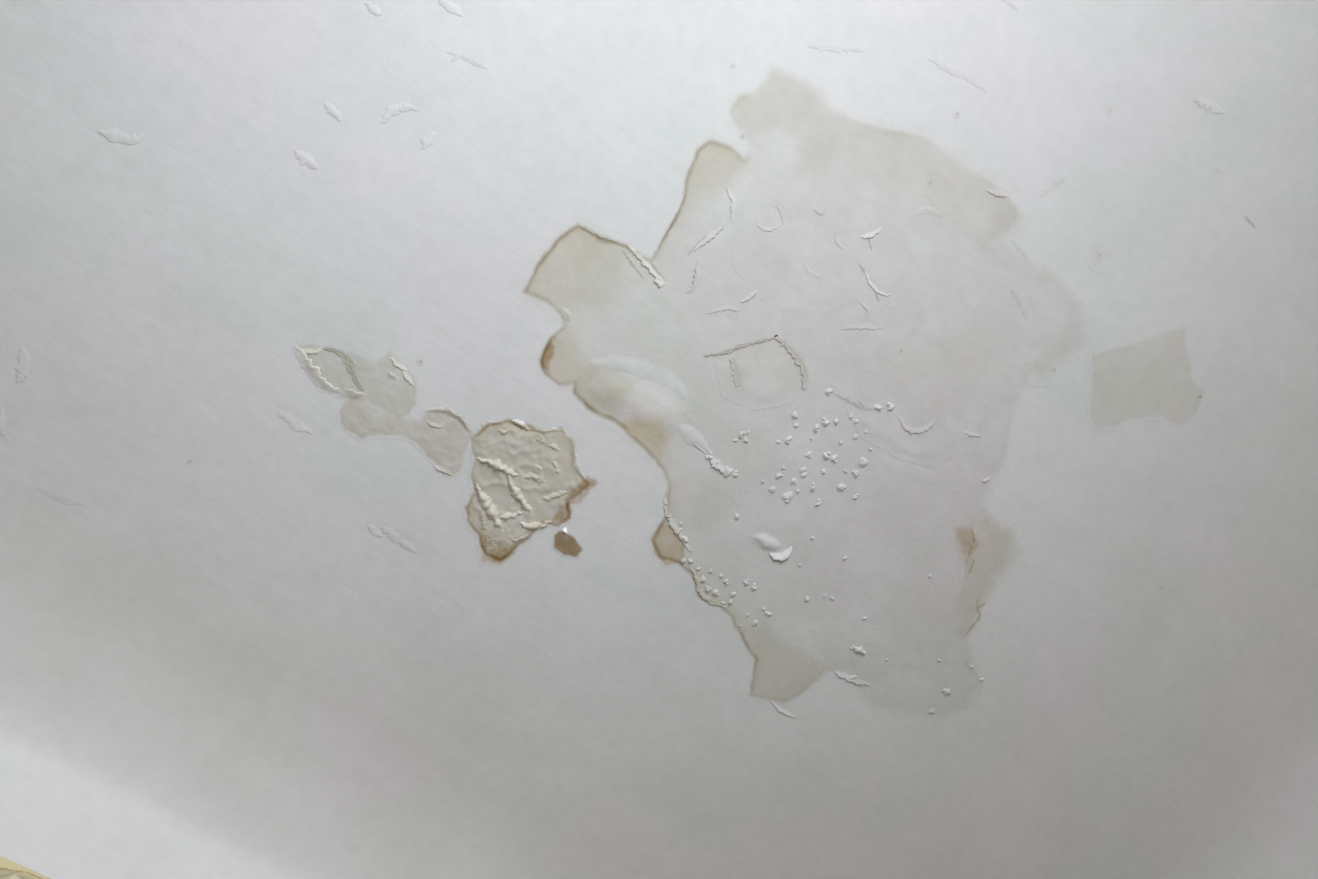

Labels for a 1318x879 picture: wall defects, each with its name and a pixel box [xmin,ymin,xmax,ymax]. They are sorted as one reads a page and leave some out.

damp [508,59,1064,492]
peeling [293,341,587,559]
damp [1087,325,1207,433]
damp [744,607,846,705]
damp [893,509,1020,681]